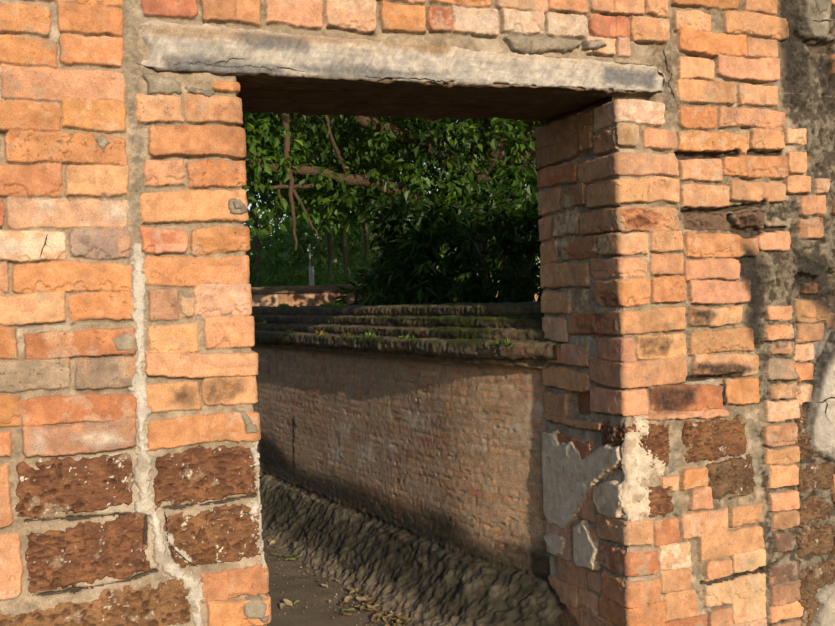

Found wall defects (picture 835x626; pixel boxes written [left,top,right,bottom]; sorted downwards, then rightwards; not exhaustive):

damp [240,416,573,626]
flaking render [542,415,666,571]